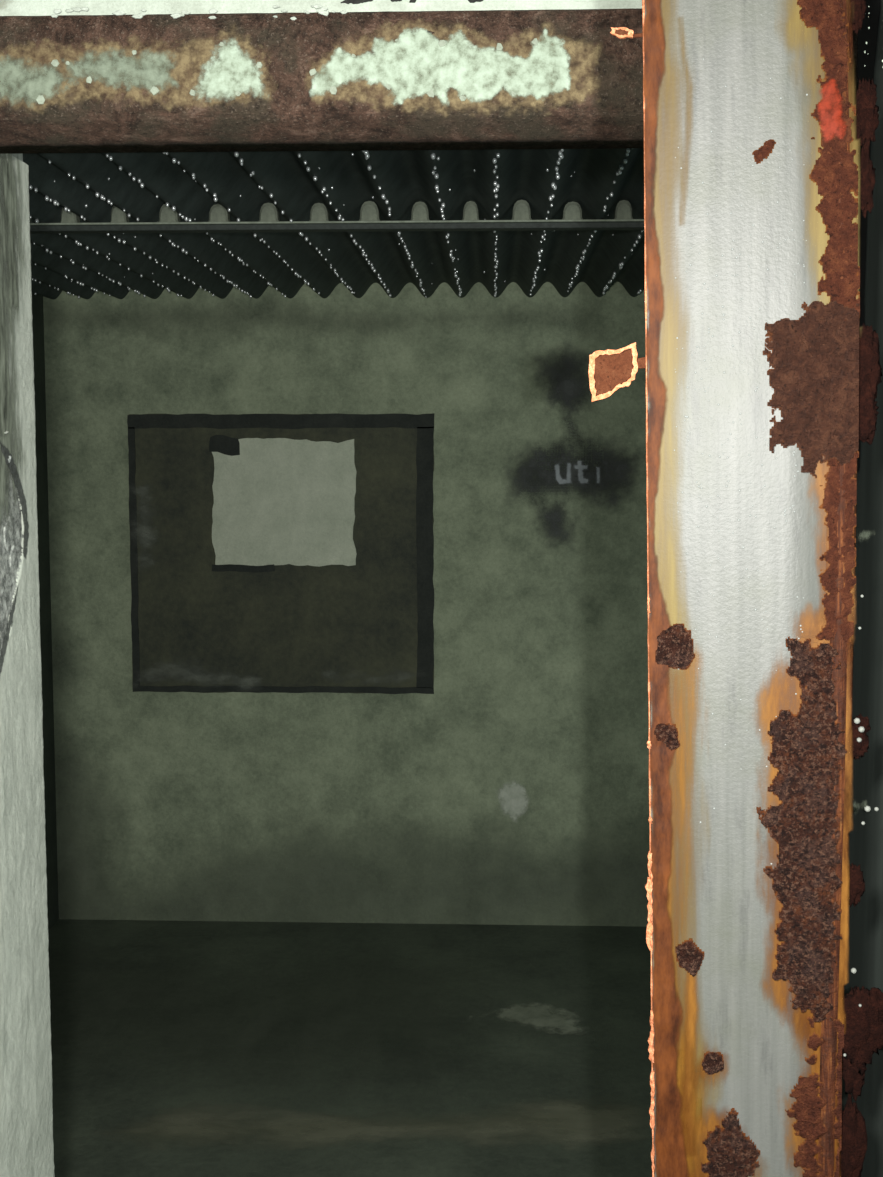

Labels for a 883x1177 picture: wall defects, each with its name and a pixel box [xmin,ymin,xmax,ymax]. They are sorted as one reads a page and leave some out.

peeling [51,7,89,18]
peeling [112,9,147,19]
peeling [272,0,373,20]
peeling [0,32,269,110]
peeling [309,23,598,111]
corrosion [752,139,776,164]
spalling [0,431,29,673]
corrosion [588,0,760,1177]
corrosion [756,0,860,1177]